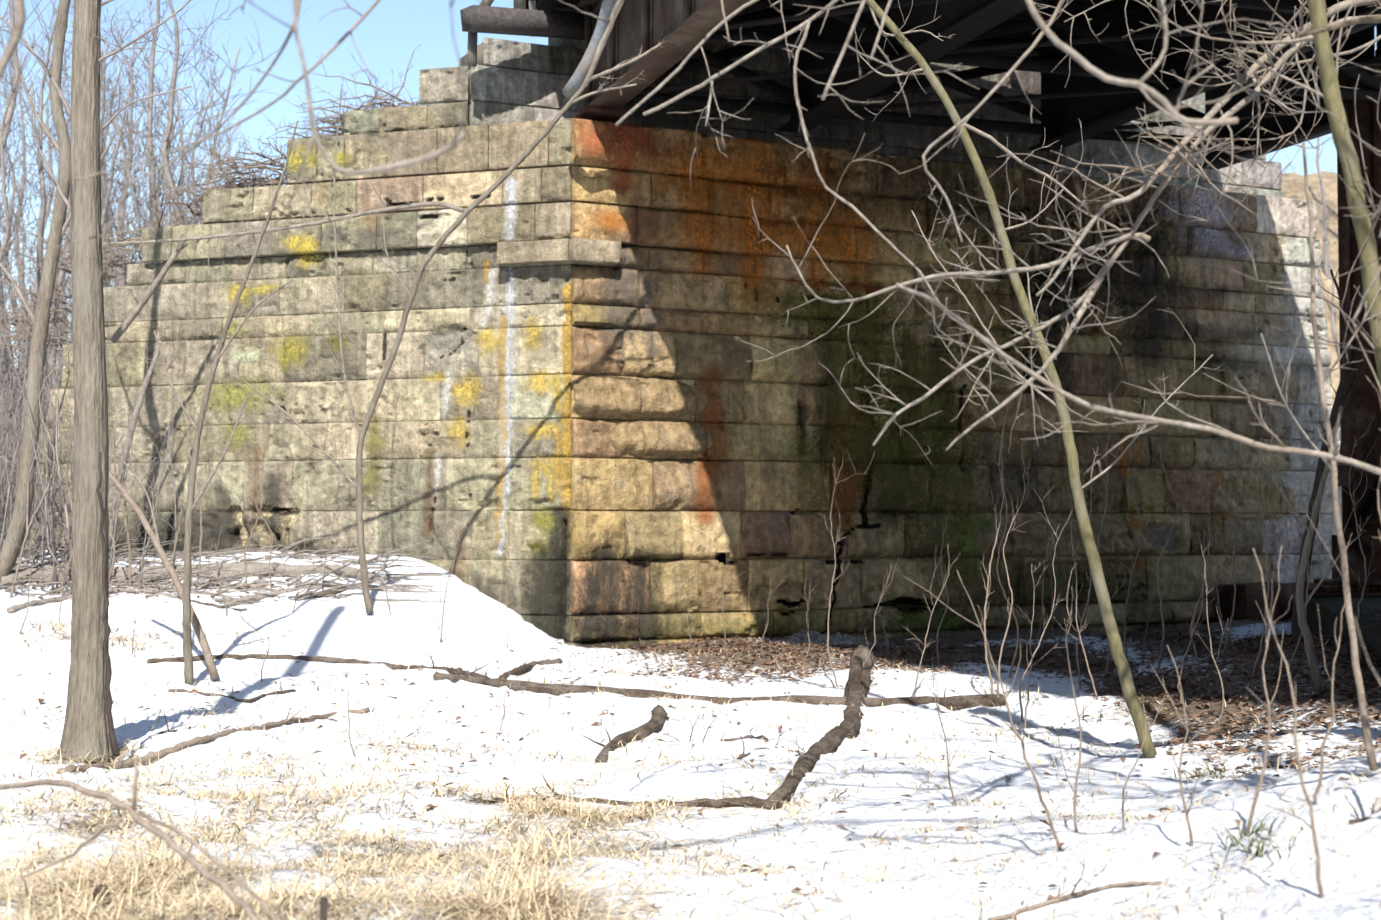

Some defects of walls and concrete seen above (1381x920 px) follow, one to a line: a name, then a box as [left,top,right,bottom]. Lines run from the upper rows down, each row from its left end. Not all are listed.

rust [581,121,656,247]
rust [679,138,873,300]
efflorescence [483,266,514,553]
rust [696,369,728,523]
leakage [769,292,968,572]
leakage [973,332,1021,376]
crack [746,550,787,558]
crack [820,462,880,634]